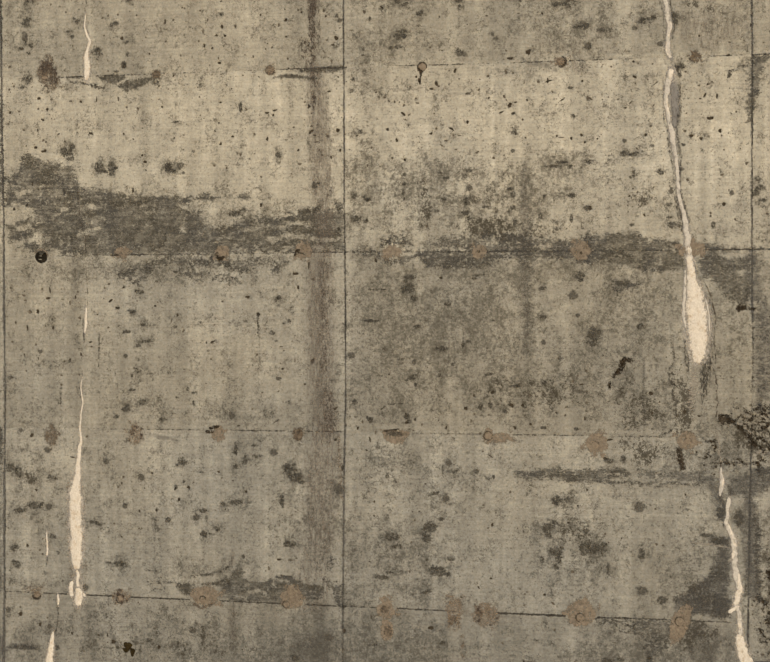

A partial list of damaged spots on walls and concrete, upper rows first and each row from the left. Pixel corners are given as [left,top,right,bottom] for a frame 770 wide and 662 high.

damp [0,0,770,412]
damp [514,446,770,662]